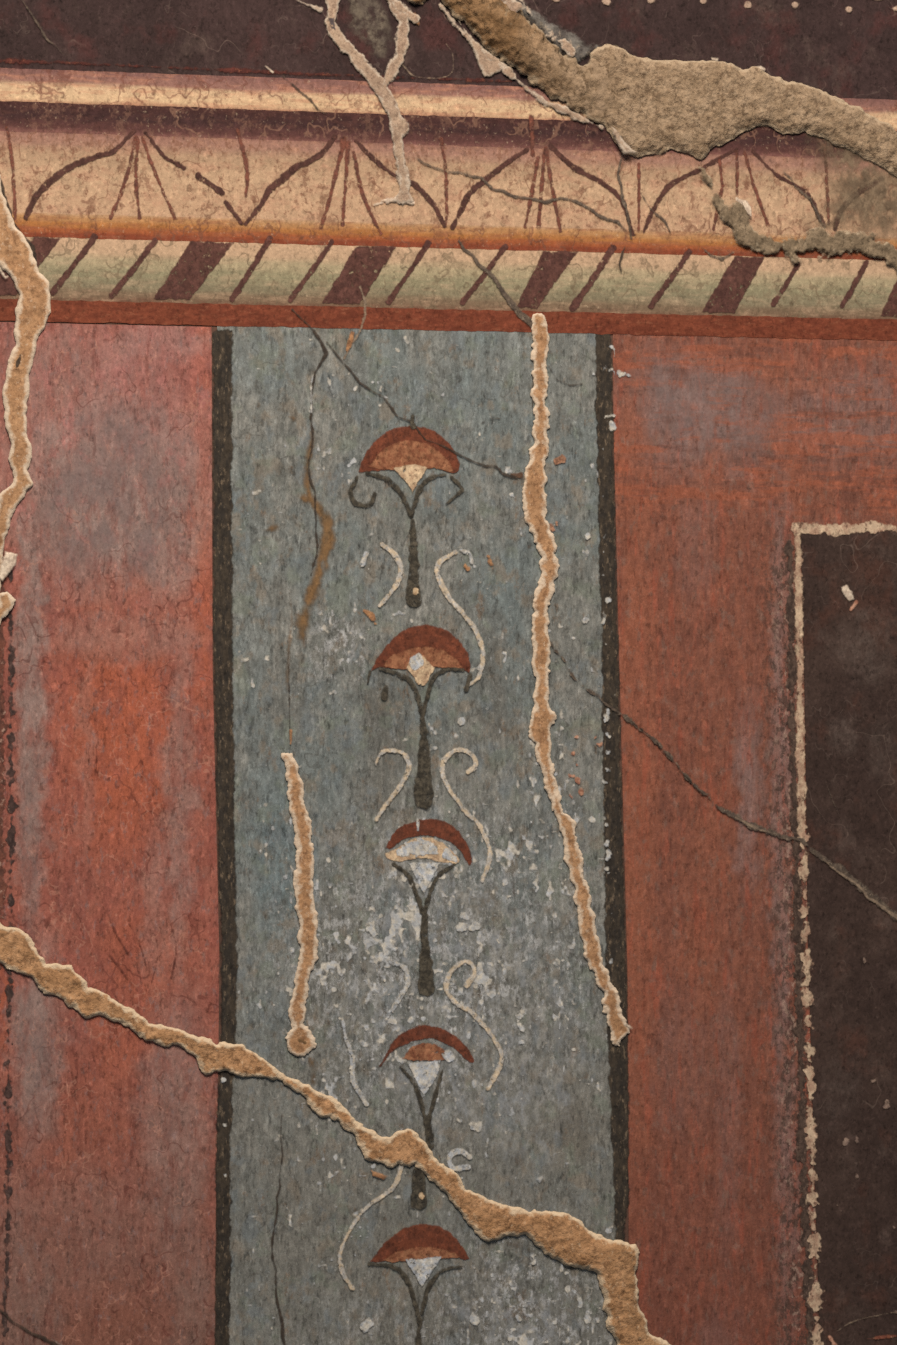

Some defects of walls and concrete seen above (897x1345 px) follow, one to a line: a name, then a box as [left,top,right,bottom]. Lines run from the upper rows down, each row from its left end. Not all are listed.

crack [23,1,52,43]
crack [283,76,327,114]
crack [298,0,897,273]
crack [0,175,51,624]
crack [291,240,897,1046]
crack [0,666,671,1345]